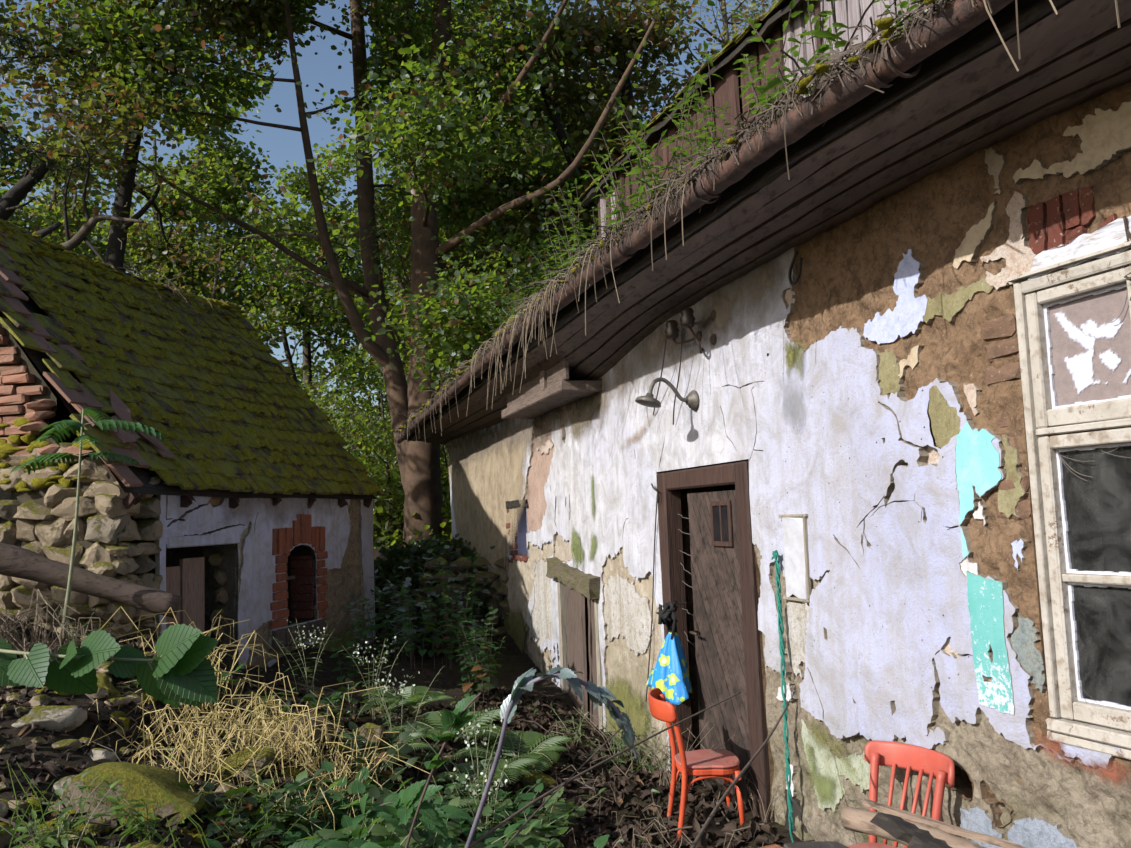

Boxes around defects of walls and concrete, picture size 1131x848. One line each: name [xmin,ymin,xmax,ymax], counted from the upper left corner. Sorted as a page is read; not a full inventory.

crack [166,504,239,536]
spalling [502,418,575,675]
spalling [603,547,668,769]
spalling [754,82,1131,848]